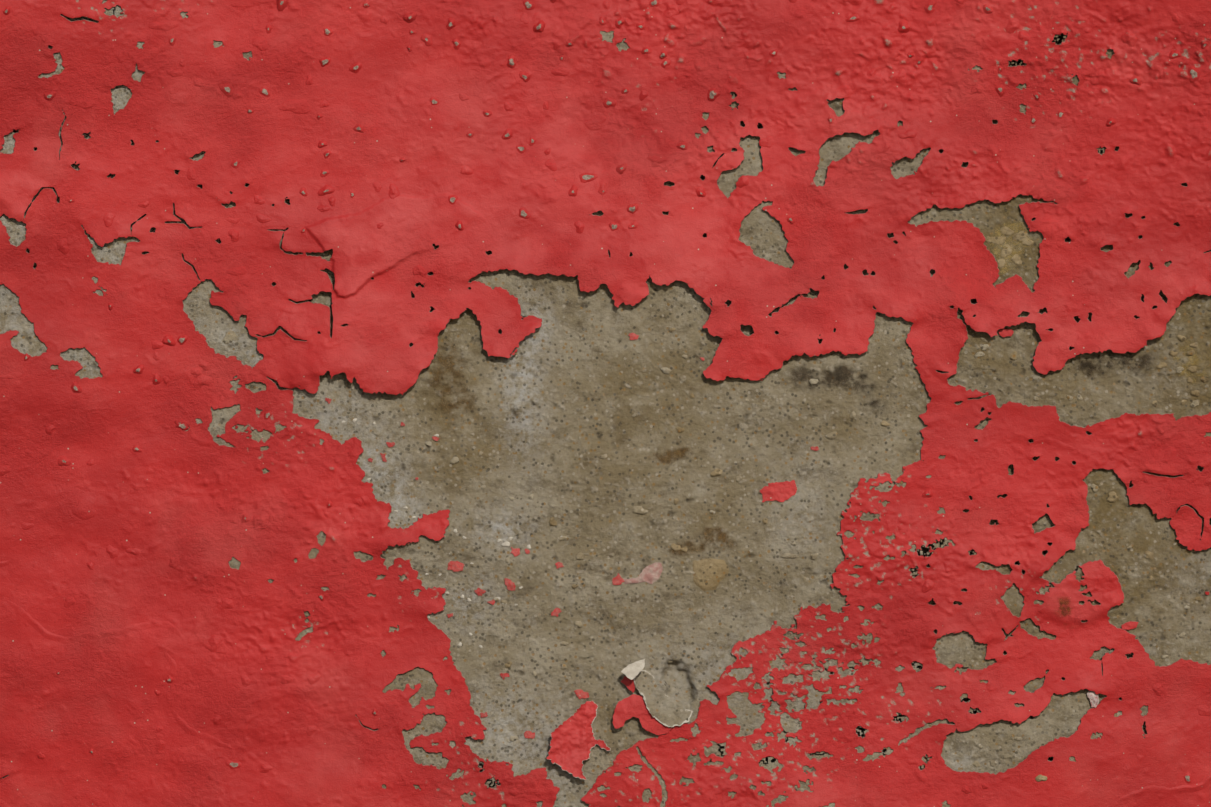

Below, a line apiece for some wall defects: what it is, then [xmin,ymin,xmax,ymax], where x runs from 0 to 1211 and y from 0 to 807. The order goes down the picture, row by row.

peeling [827,98,845,116]
peeling [789,130,880,186]
peeling [739,201,794,269]
peeling [908,194,1057,292]
peeling [1124,260,1171,278]
peeling [0,284,103,378]
peeling [183,279,286,450]
peeling [947,290,1211,429]
peeling [292,269,955,807]
peeling [969,469,1211,666]
peeling [933,631,997,683]
peeling [855,670,1107,774]